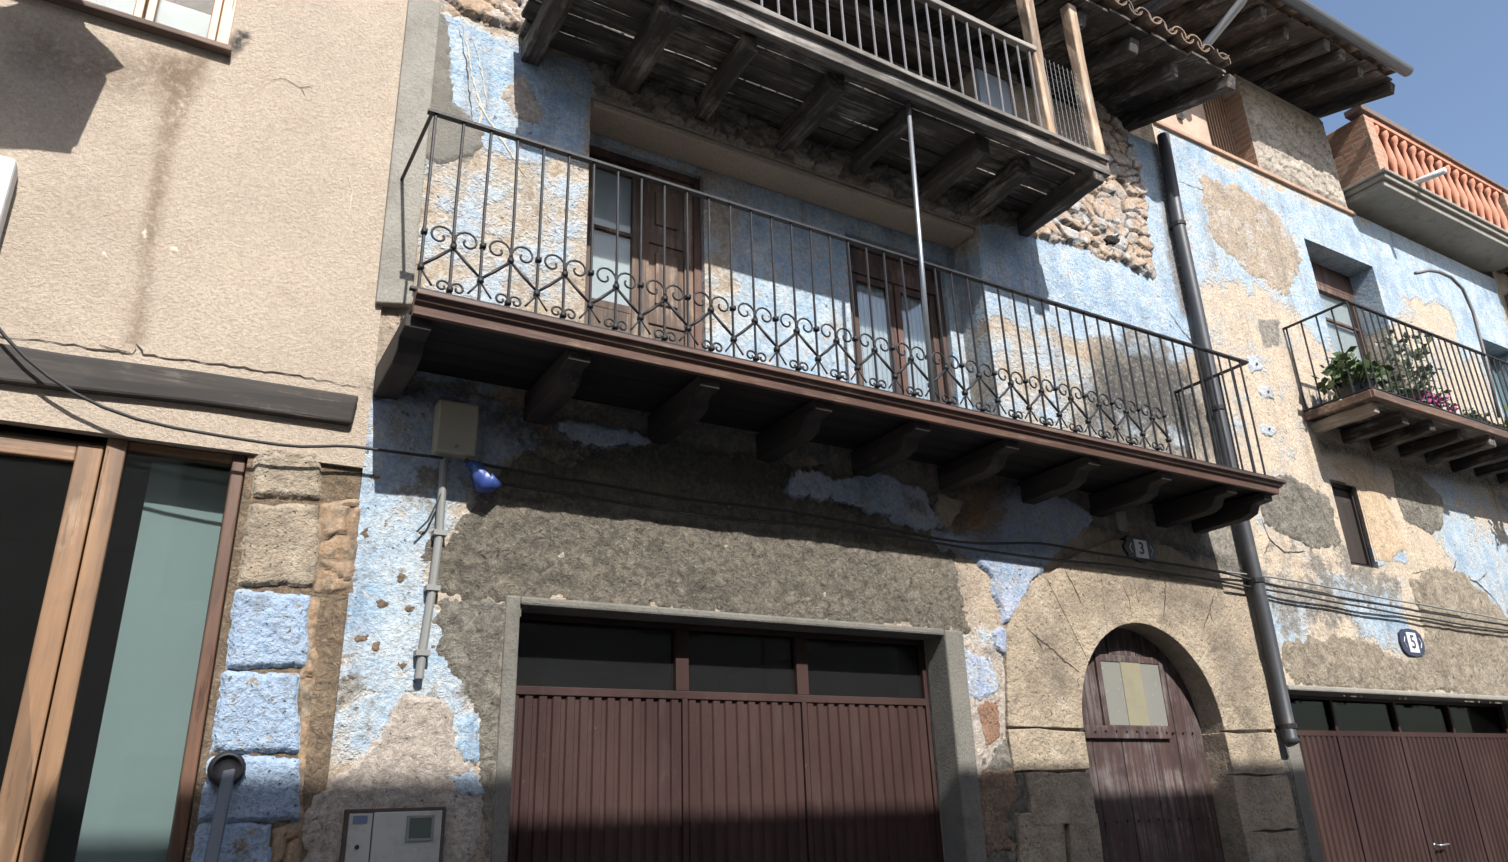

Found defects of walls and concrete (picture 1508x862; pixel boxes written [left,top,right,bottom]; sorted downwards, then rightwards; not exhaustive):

leakage [164,60,198,104]
spalling [1198,173,1303,297]
crack [0,336,360,388]
spalling [1260,473,1342,550]
spalling [1390,468,1444,535]
peeling [354,634,381,652]
spalling [366,386,1093,862]
spalling [1281,565,1508,703]